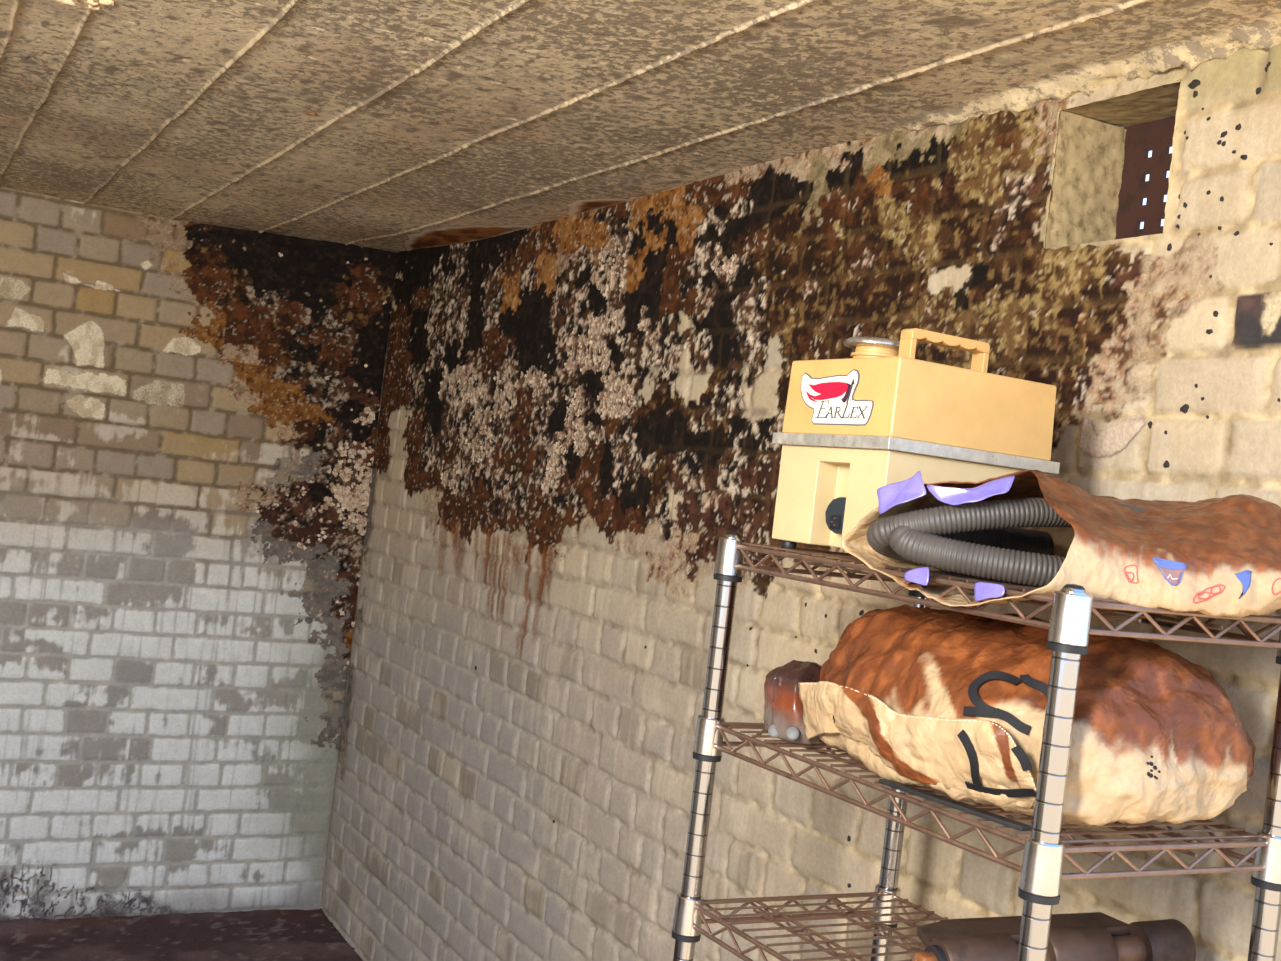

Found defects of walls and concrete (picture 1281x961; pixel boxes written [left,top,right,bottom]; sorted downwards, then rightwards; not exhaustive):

spalling [73,0,114,12]
peeling [0,278,45,332]
peeling [62,272,119,291]
peeling [44,321,185,420]
peeling [162,337,202,356]
damp [142,99,1149,780]